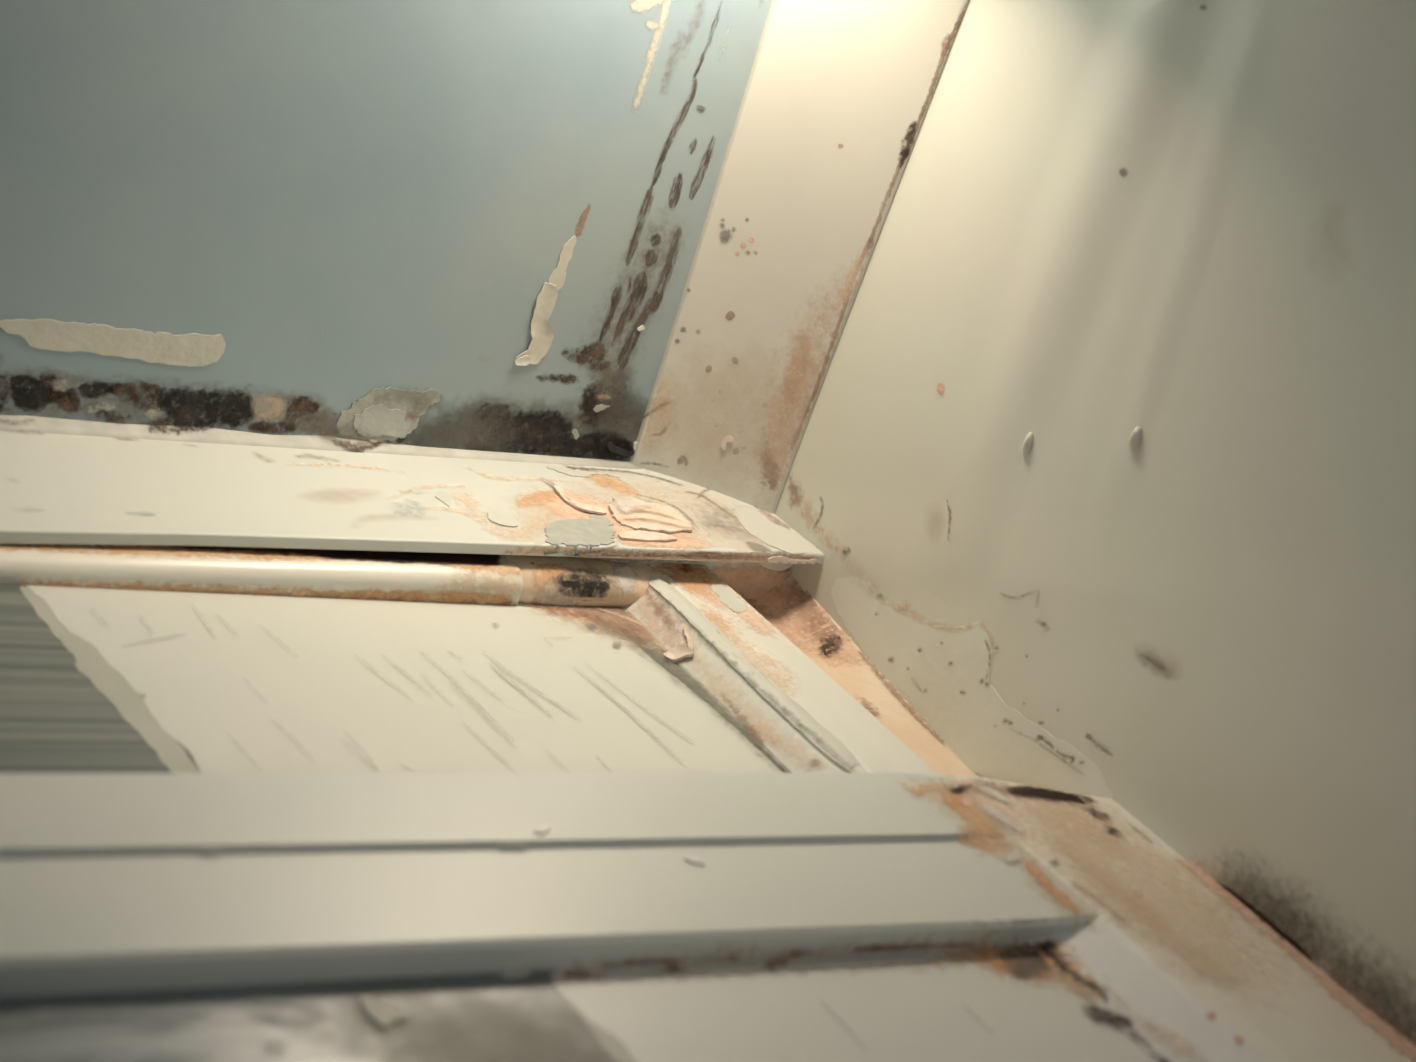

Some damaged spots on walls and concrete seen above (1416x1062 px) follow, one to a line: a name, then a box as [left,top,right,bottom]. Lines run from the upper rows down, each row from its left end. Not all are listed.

peeling [631,0,671,109]
water stain [721,219,757,255]
peeling [0,319,226,367]
water stain [0,3,722,601]
peeling [514,204,590,366]
peeling [333,387,441,452]
peeling [541,465,693,554]
rust [22,578,517,606]
rust [654,563,788,686]
rust [911,781,1015,853]
rust [855,944,1003,965]
water stain [1222,878,1413,1040]